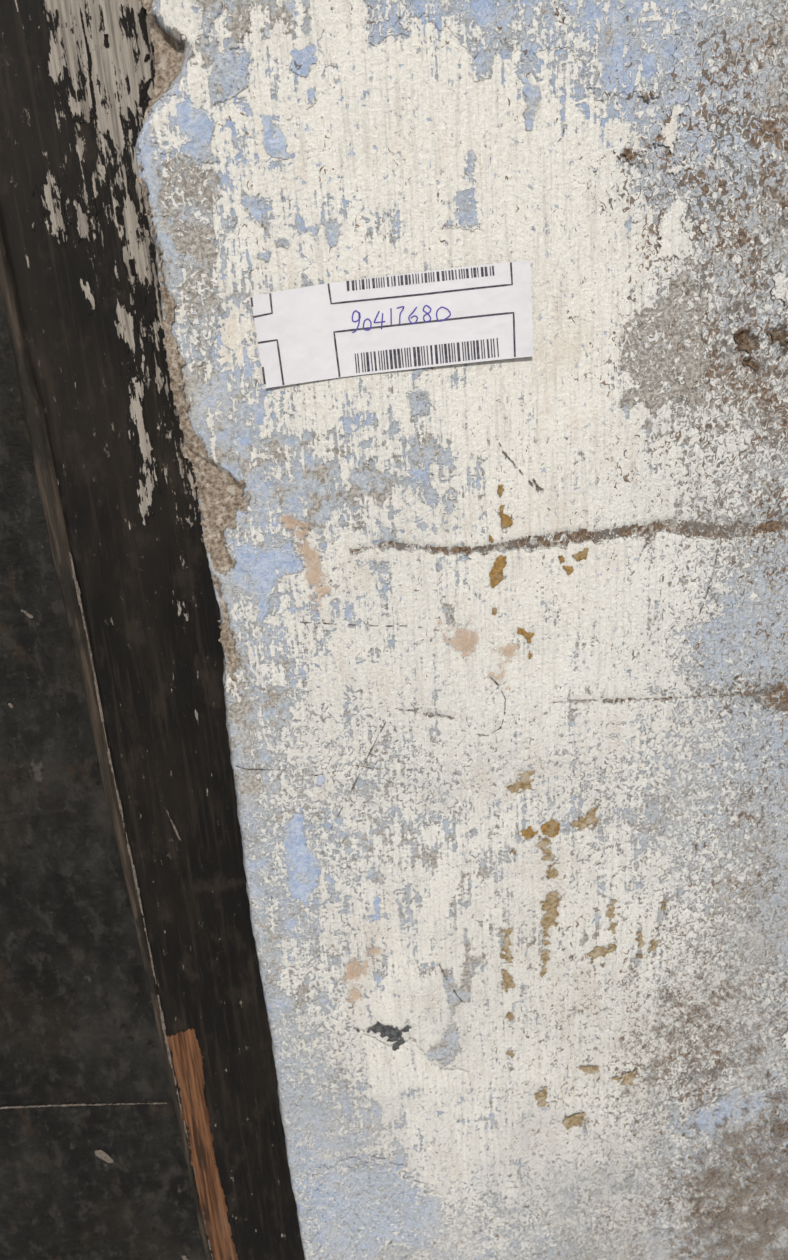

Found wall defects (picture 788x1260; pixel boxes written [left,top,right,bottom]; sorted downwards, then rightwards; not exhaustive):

peeling [259,44,318,159]
peeling [438,149,485,231]
peeling [31,0,305,693]
peeling [400,367,456,533]
peeling [348,460,397,542]
peeling [489,484,513,542]
peeling [489,555,507,588]
crack [349,518,788,615]
rust [438,621,479,657]
rust [488,644,520,690]
peeling [517,627,534,659]
peeling [665,555,788,712]